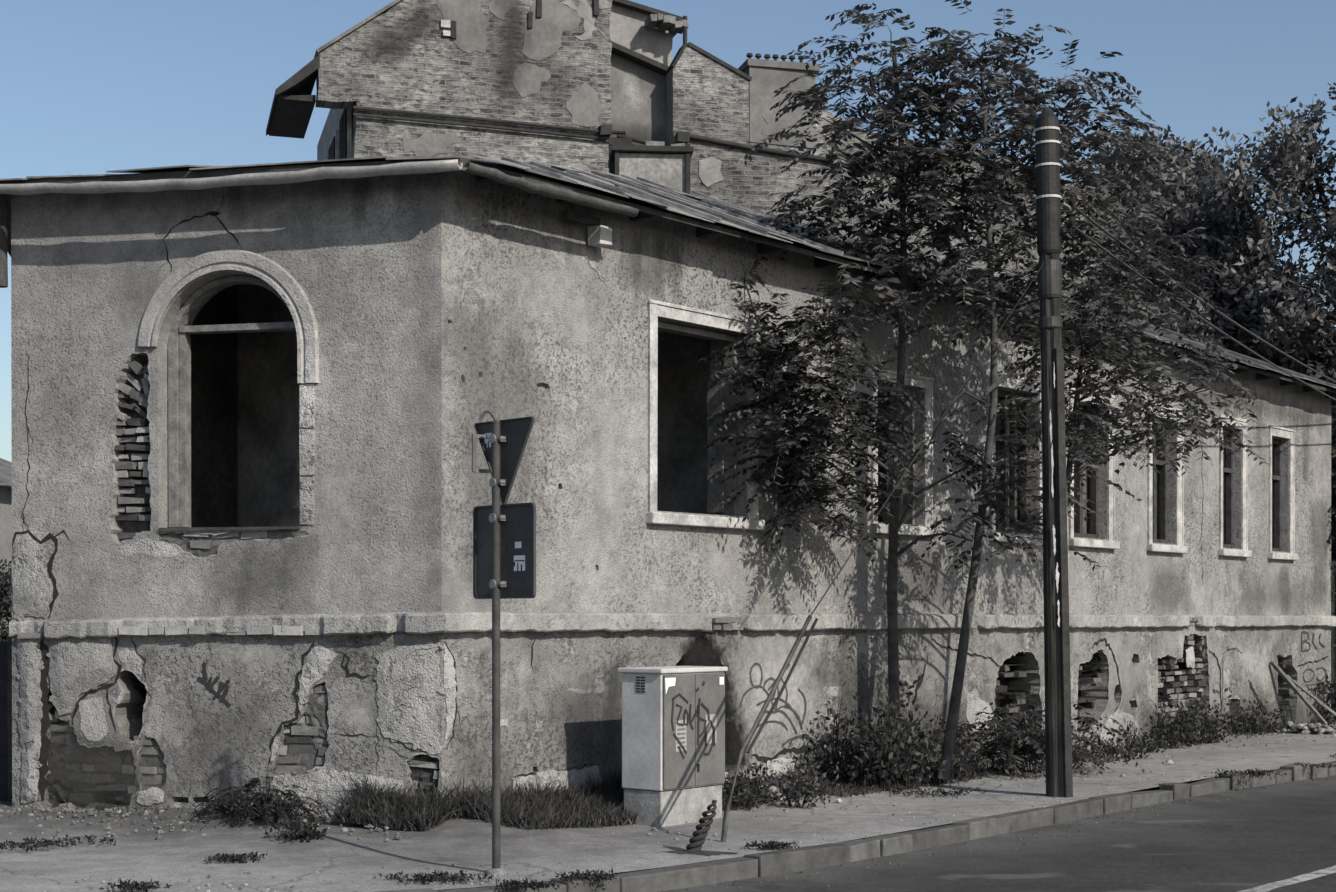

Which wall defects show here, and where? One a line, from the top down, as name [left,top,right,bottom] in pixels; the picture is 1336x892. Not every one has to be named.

flaking render [437,0,608,98]
flaking render [566,81,602,127]
crack [158,189,243,272]
flaking render [107,355,312,559]
flaking render [12,534,55,621]
crack [12,353,152,801]
flaking render [16,637,169,811]
flaking render [270,642,339,773]
flaking render [443,643,457,745]
spalling [966,650,1043,747]
spalling [1077,648,1139,750]
flaking render [1157,632,1210,733]